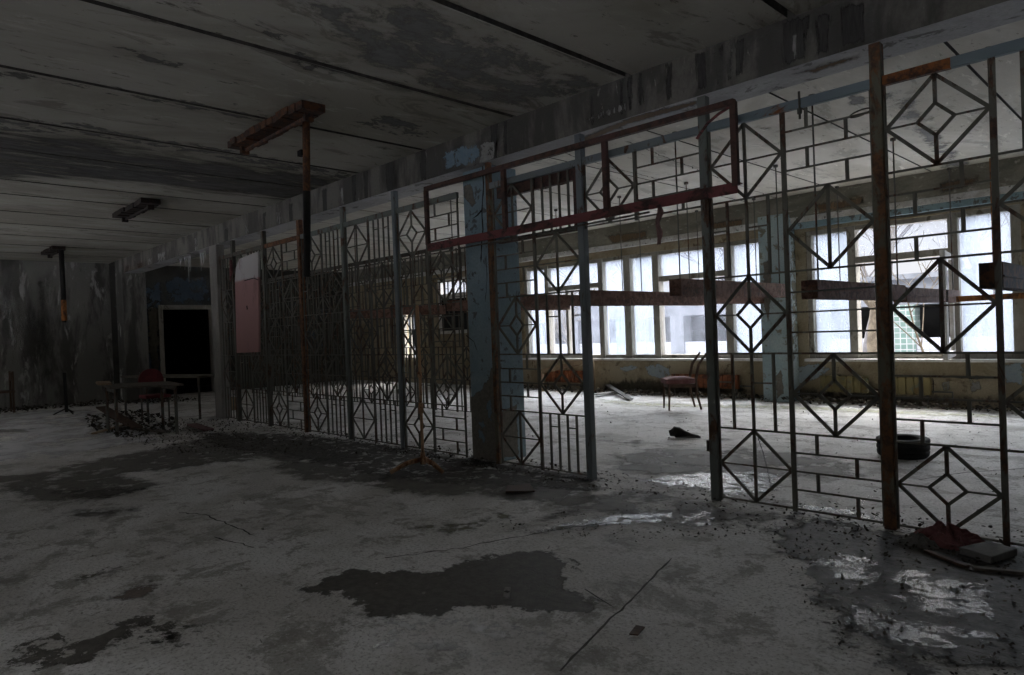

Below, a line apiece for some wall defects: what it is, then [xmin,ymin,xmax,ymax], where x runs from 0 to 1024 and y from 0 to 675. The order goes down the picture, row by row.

leakage [310,4,644,125]
peeling [443,141,495,169]
leakage [0,437,596,517]
leakage [7,612,214,672]
leakage [299,550,603,618]
crack [559,558,672,671]